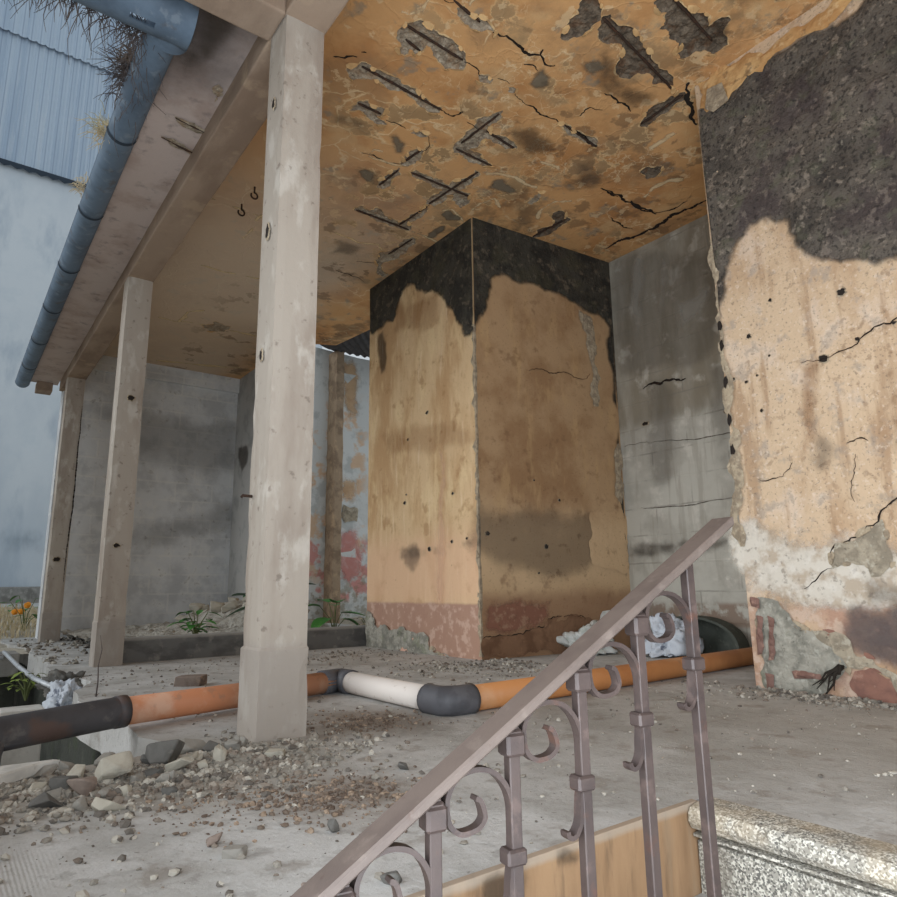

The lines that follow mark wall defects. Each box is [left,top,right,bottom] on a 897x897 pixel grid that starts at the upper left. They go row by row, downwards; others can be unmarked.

crack [493,32,555,71]
crack [466,62,631,146]
spalling [560,0,686,129]
spalling [653,0,731,61]
peeling [697,0,851,112]
spalling [353,110,573,277]
crack [802,317,897,363]
crack [848,437,867,502]
leakage [730,519,897,664]
crack [804,498,897,589]
flaking render [827,519,896,577]
flaking render [750,597,897,704]